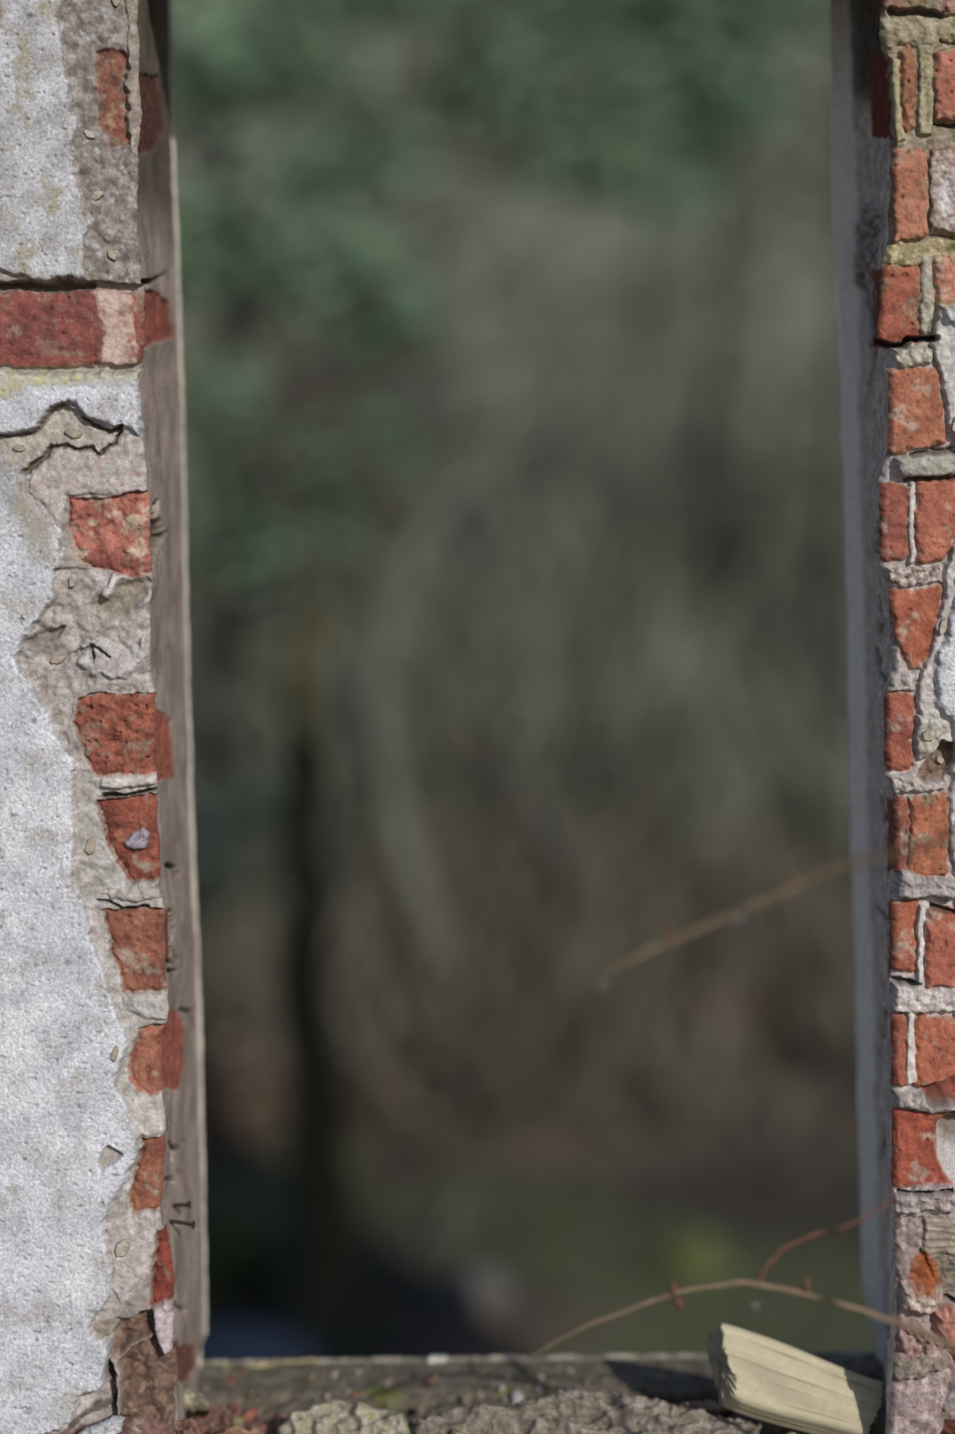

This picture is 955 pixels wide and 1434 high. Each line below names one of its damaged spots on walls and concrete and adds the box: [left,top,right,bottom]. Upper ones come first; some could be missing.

flaking render [0,406,122,469]
crack [0,403,124,475]
flaking render [930,304,955,440]
spalling [150,500,163,559]
flaking render [18,568,156,753]
flaking render [915,541,955,863]
flaking render [72,770,178,1426]
flaking render [922,1075,955,1183]